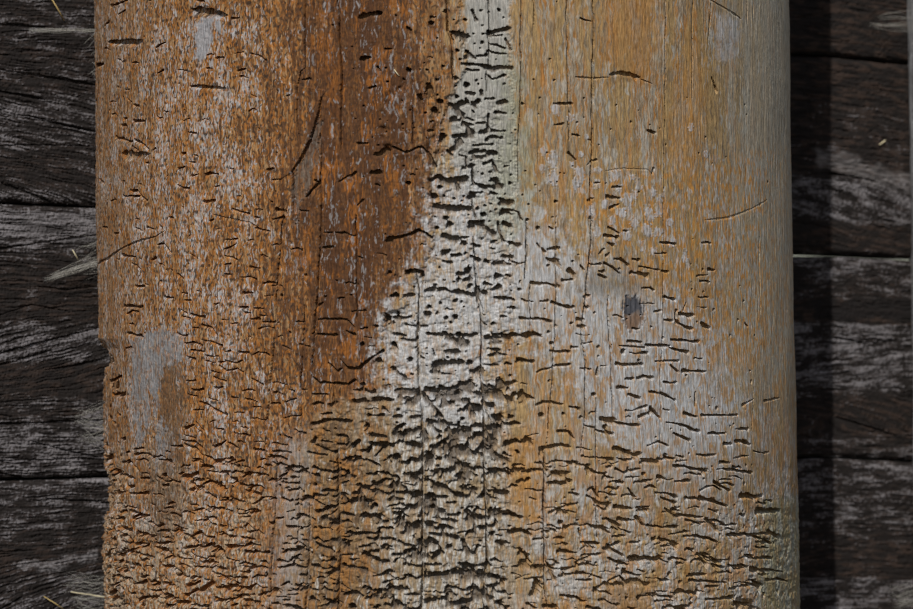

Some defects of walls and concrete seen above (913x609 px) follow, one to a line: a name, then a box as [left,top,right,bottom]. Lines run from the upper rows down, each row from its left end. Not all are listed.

crack [292,13,343,205]
crack [416,276,426,609]